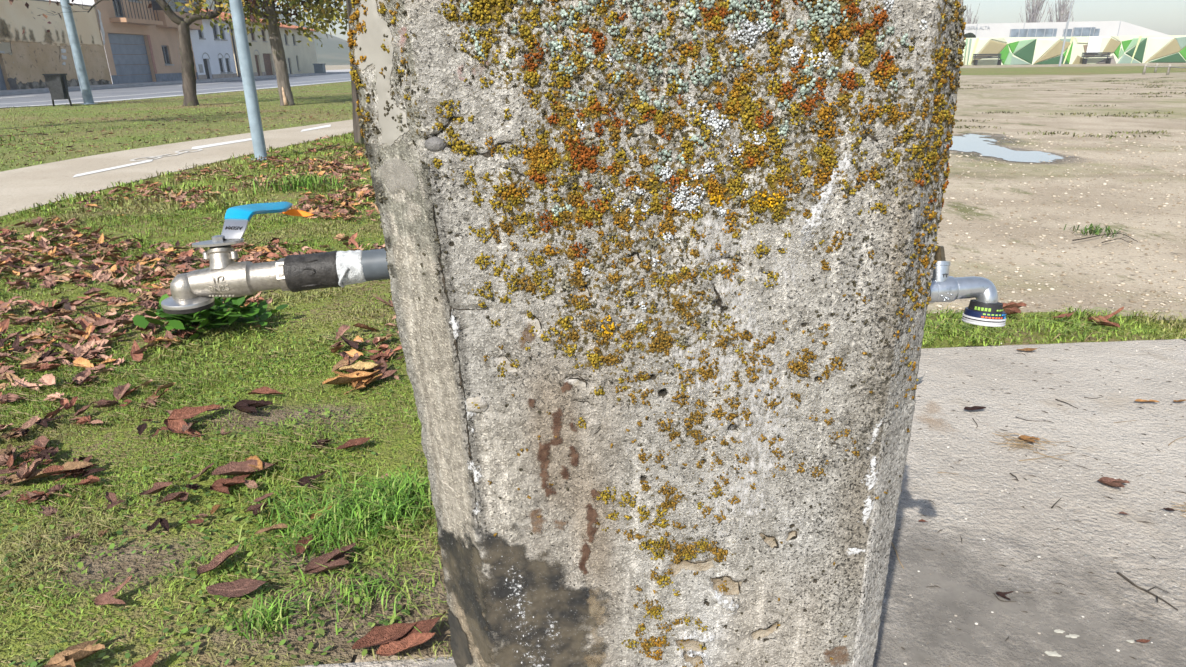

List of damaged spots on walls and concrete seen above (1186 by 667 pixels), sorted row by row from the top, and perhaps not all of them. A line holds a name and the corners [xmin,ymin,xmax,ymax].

rust [537,408,579,497]
rust [530,509,566,534]
rust [578,489,601,575]
leakage [431,502,608,667]